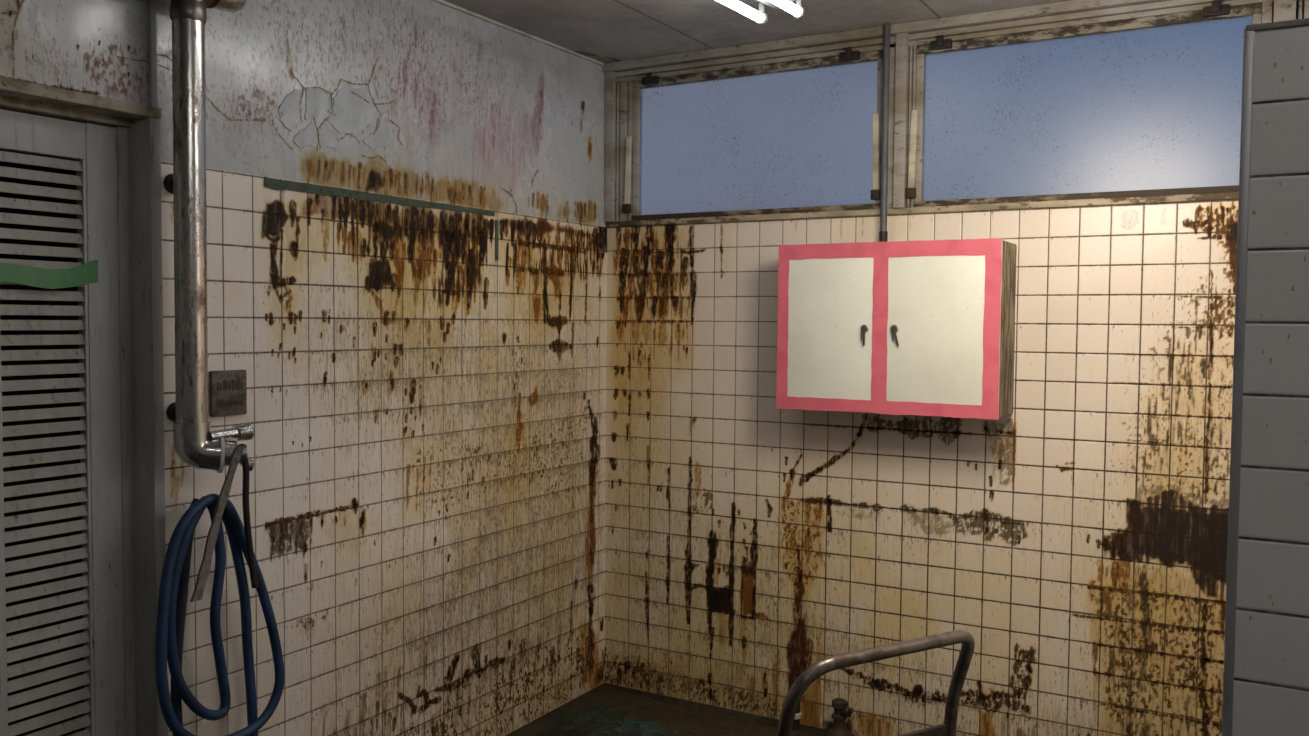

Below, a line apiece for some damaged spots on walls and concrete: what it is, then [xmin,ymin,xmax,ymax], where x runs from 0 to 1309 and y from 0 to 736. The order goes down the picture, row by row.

peeling [278,86,389,149]
leakage [265,498,375,561]
rust [262,159,705,681]
rust [666,414,868,710]
leakage [802,416,1028,545]
leakage [1073,271,1235,736]
leakage [371,601,780,736]
leakage [841,643,1035,719]